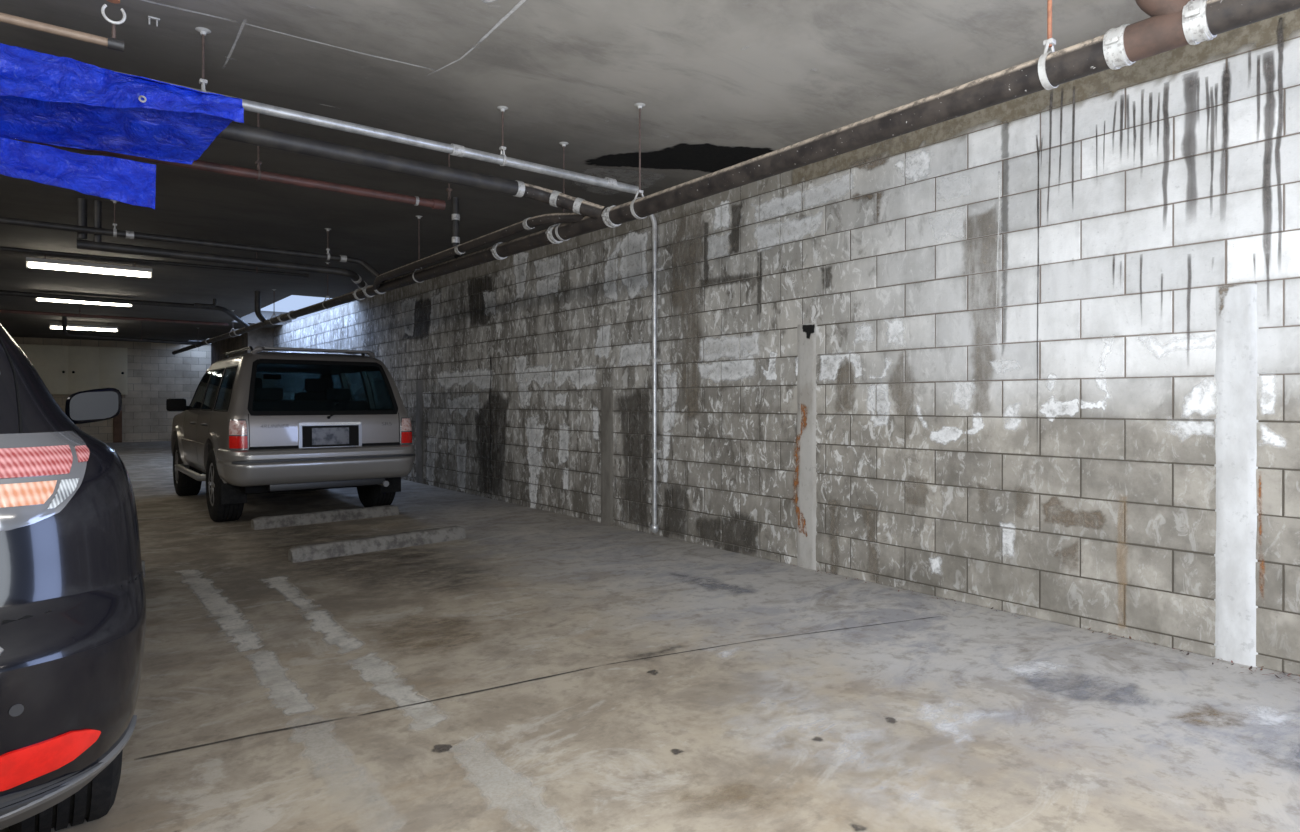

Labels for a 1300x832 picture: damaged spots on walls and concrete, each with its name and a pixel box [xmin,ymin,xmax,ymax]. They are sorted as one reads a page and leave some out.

crack [141,0,526,71]
spalling [574,143,774,194]
damp [401,293,440,339]
damp [408,8,1300,555]
rust [794,404,807,537]